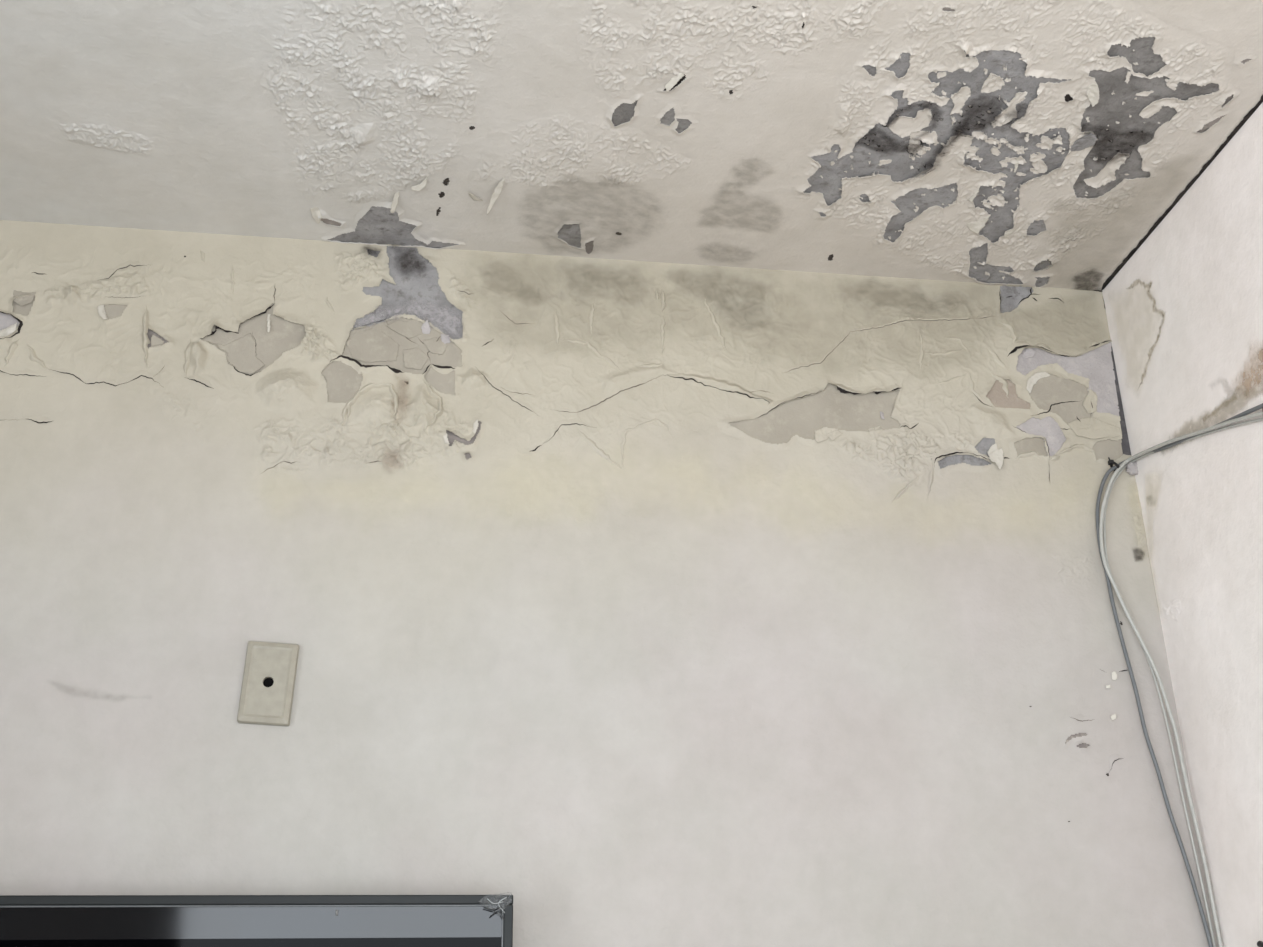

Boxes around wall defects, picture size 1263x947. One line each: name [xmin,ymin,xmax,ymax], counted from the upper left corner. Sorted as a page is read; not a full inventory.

spalling [794,28,1259,318]
peeling [0,290,44,337]
crack [5,415,54,423]
crack [97,260,151,298]
crack [0,284,276,389]
peeling [137,296,312,381]
spalling [310,192,472,413]
peeling [439,415,488,466]
crack [330,288,1111,451]
peeling [717,375,911,453]
crack [932,401,1093,486]
peeling [931,332,1132,478]